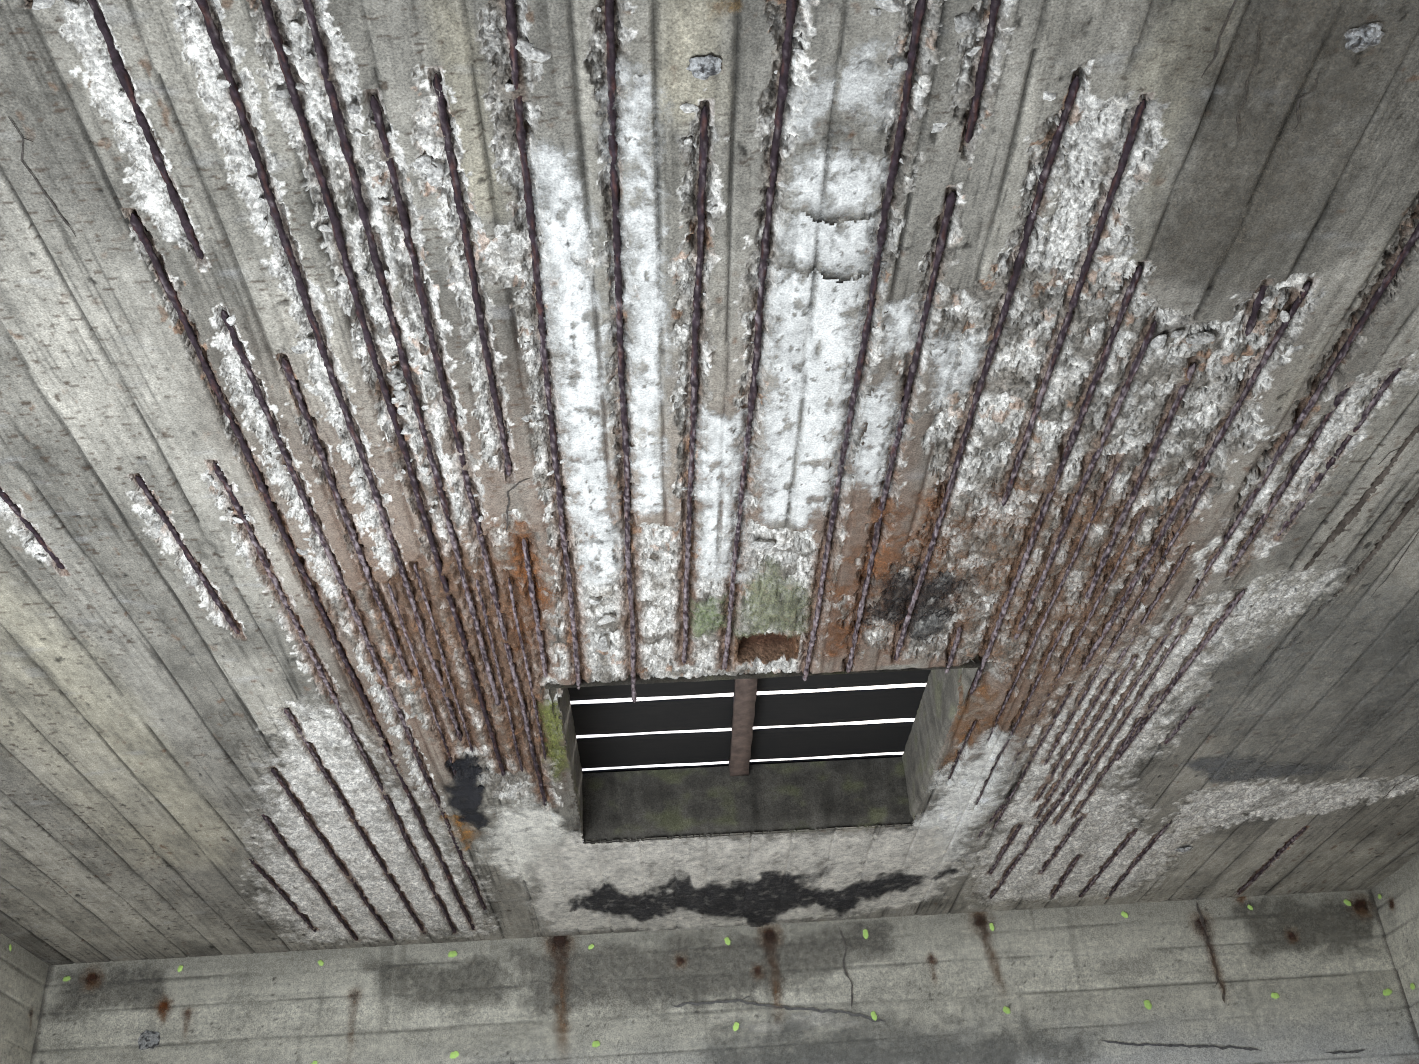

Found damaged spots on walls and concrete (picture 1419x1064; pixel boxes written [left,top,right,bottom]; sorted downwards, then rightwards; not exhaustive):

spalling [948,0,1020,171]
peeling [778,212,873,274]
spalling [822,0,918,386]
peeling [622,201,668,514]
peeling [760,271,868,527]
corrosion [392,520,552,760]
water stain [863,564,965,641]
corrosion [547,935,571,1039]
water stain [365,727,1012,1014]
crack [1102,1040,1261,1051]
corrosion [1194,917,1223,986]
crack [1193,902,1225,1003]